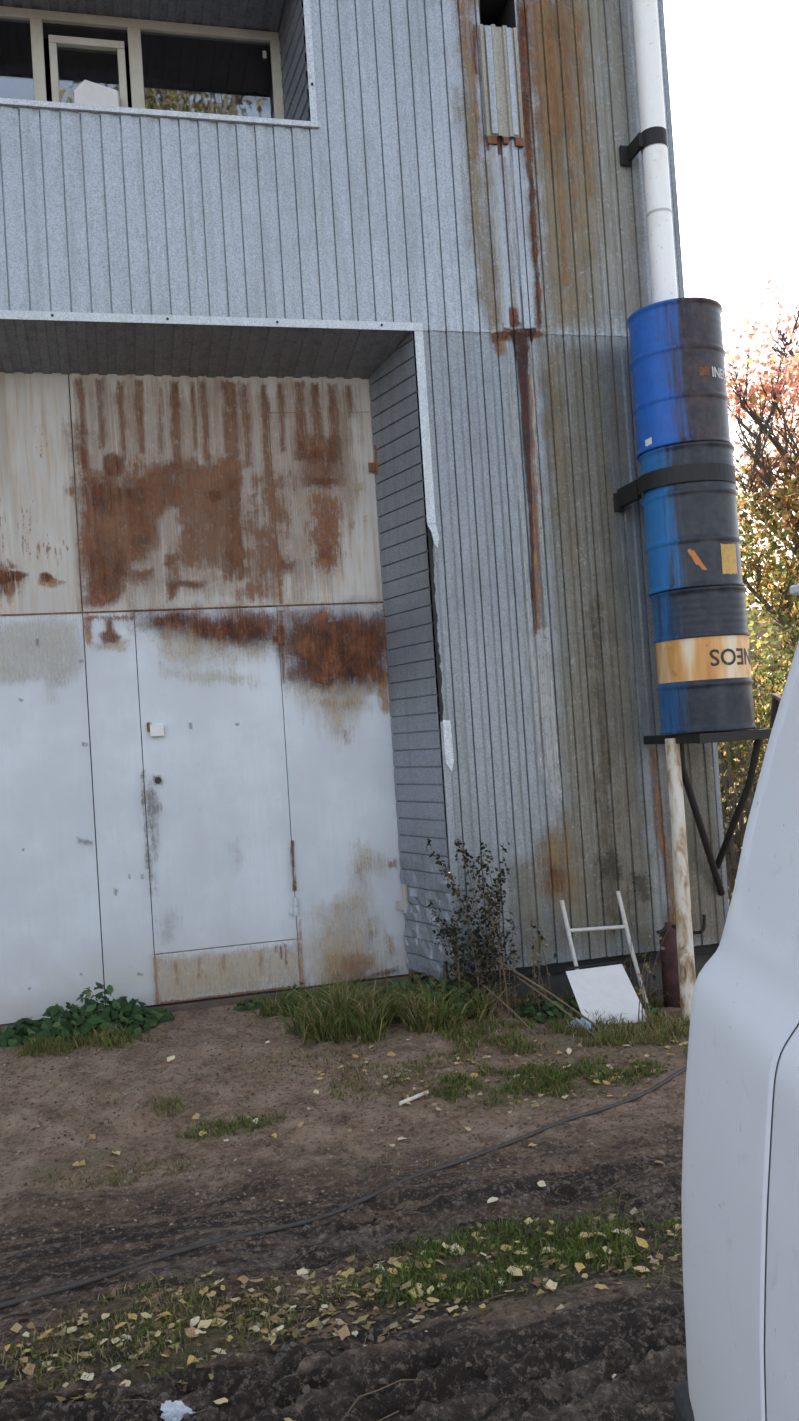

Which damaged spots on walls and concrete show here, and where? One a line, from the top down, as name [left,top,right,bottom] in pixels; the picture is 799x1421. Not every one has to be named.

corrosion [0,379,389,729]
corrosion [461,0,589,634]